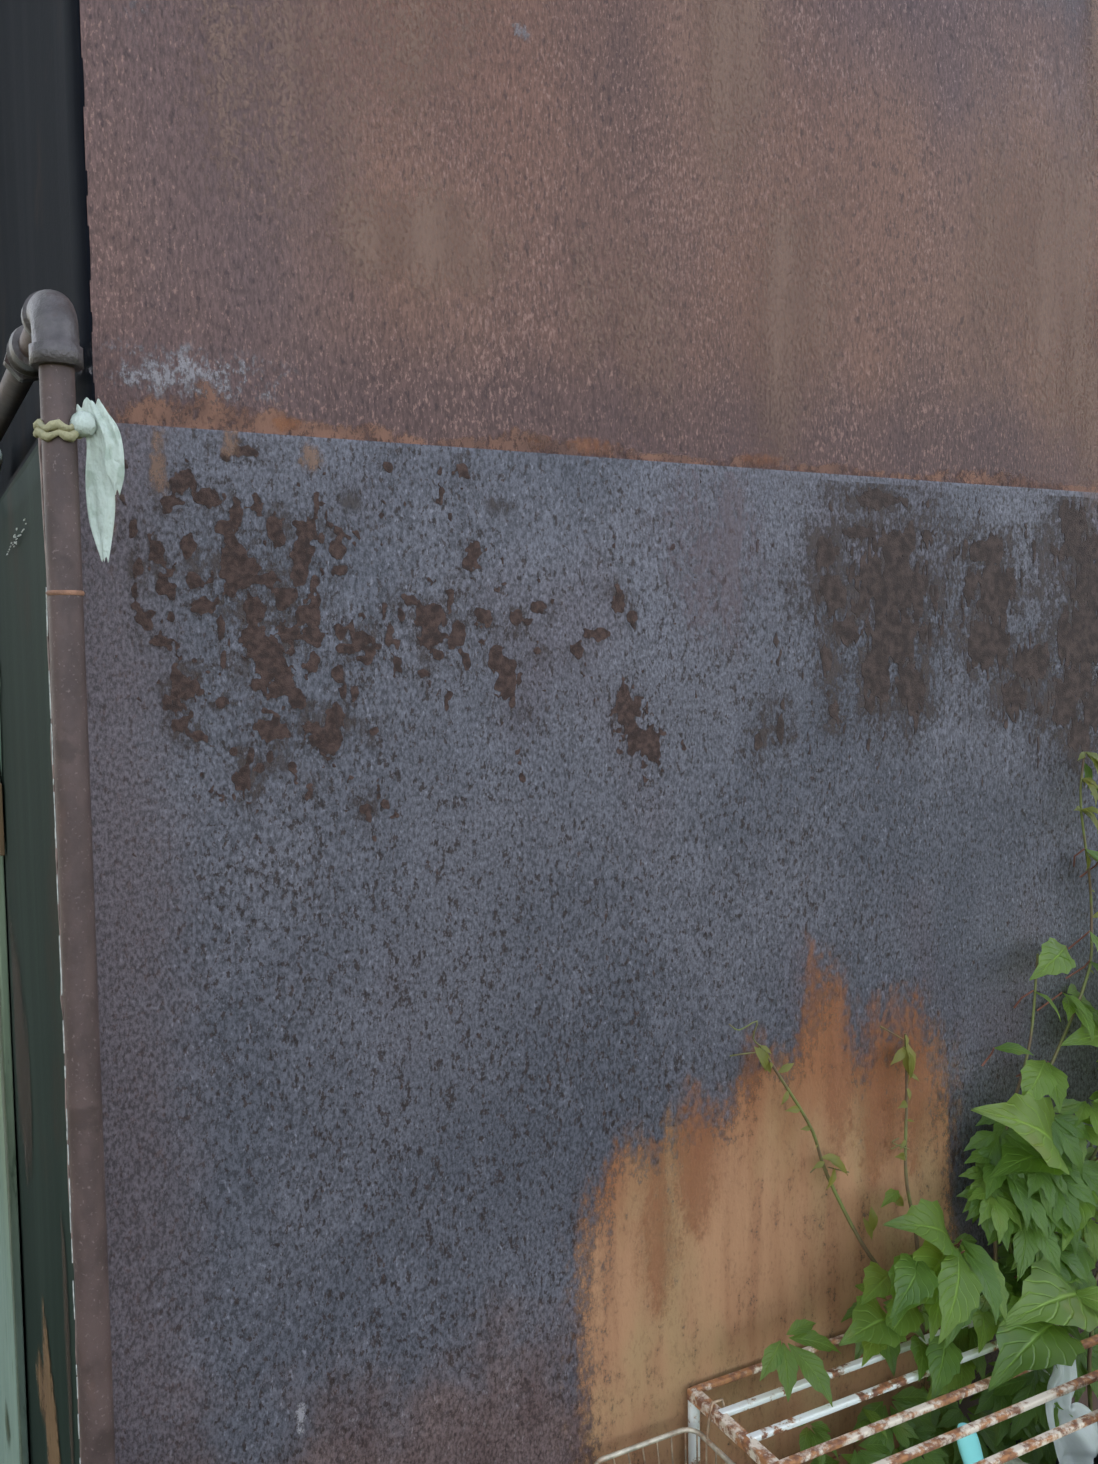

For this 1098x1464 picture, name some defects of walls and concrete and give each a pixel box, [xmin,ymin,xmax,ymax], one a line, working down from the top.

rust [105,380,1098,493]
rust [574,947,956,1464]